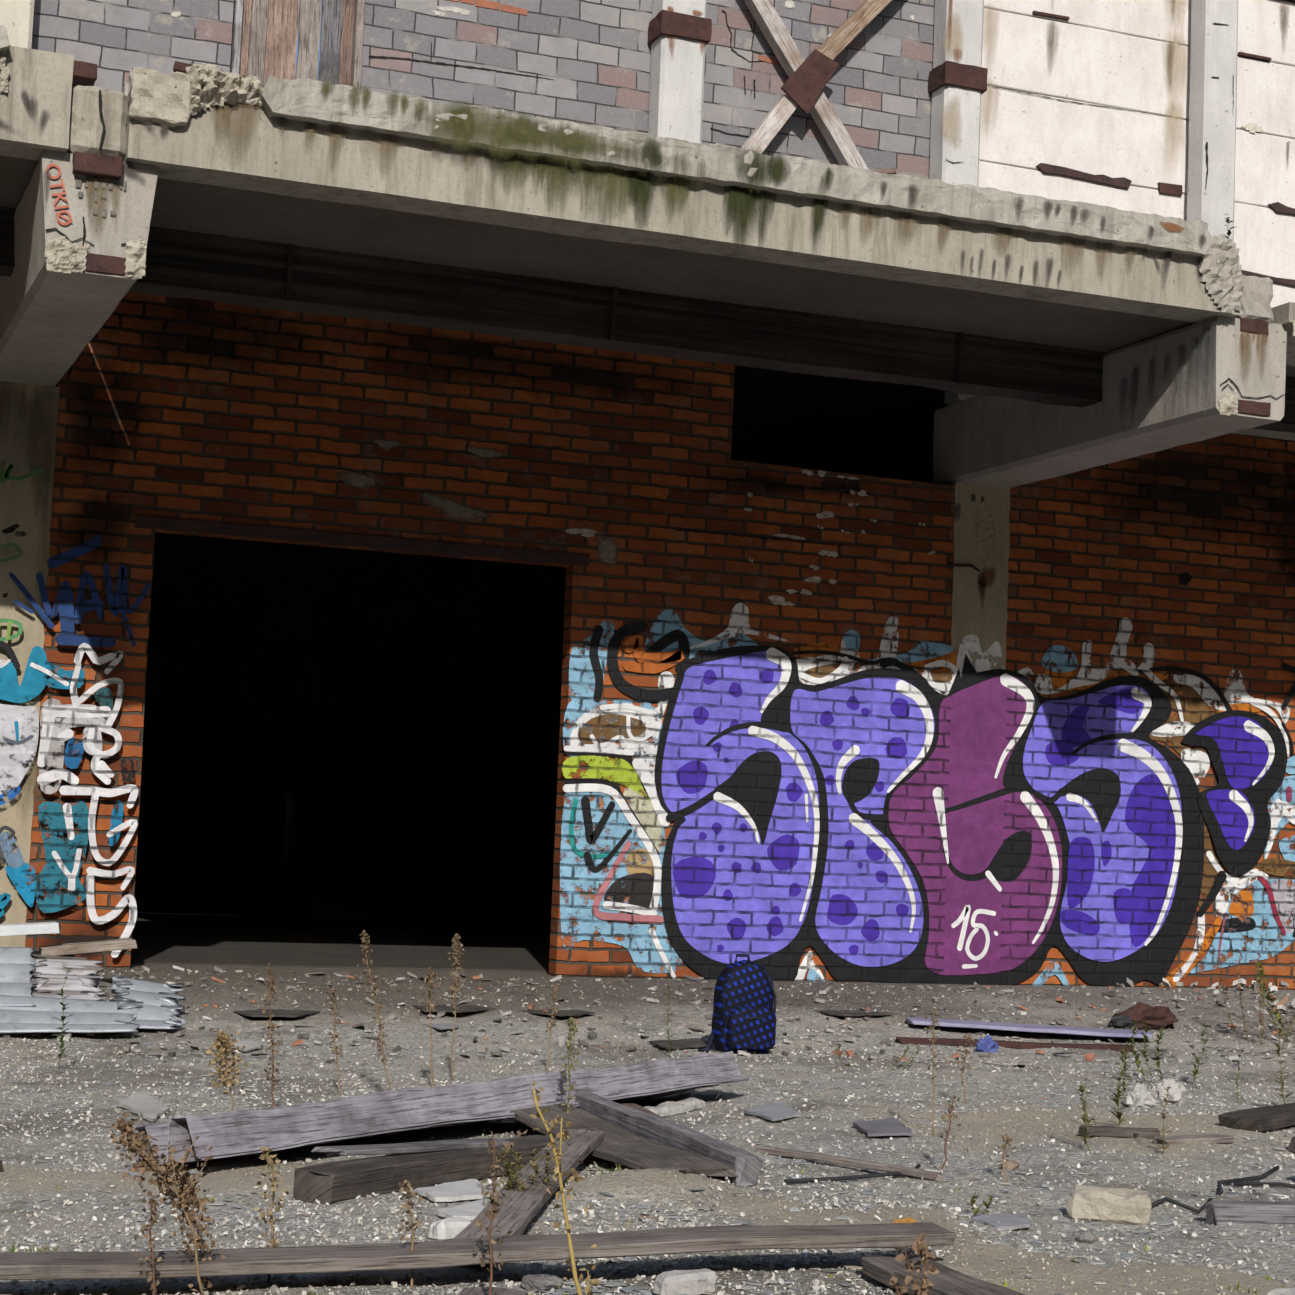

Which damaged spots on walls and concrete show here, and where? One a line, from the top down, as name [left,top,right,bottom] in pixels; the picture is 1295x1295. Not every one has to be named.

crack [97,90,105,151]
spalling [128,63,265,127]
damp [490,140,688,217]
damp [726,153,786,240]
damp [814,169,832,239]
damp [904,186,918,235]
damp [1046,202,1087,221]
spalling [45,236,90,273]
spalling [124,237,147,279]
damp [962,227,1073,283]
damp [1128,226,1172,269]
spalling [1199,234,1244,313]